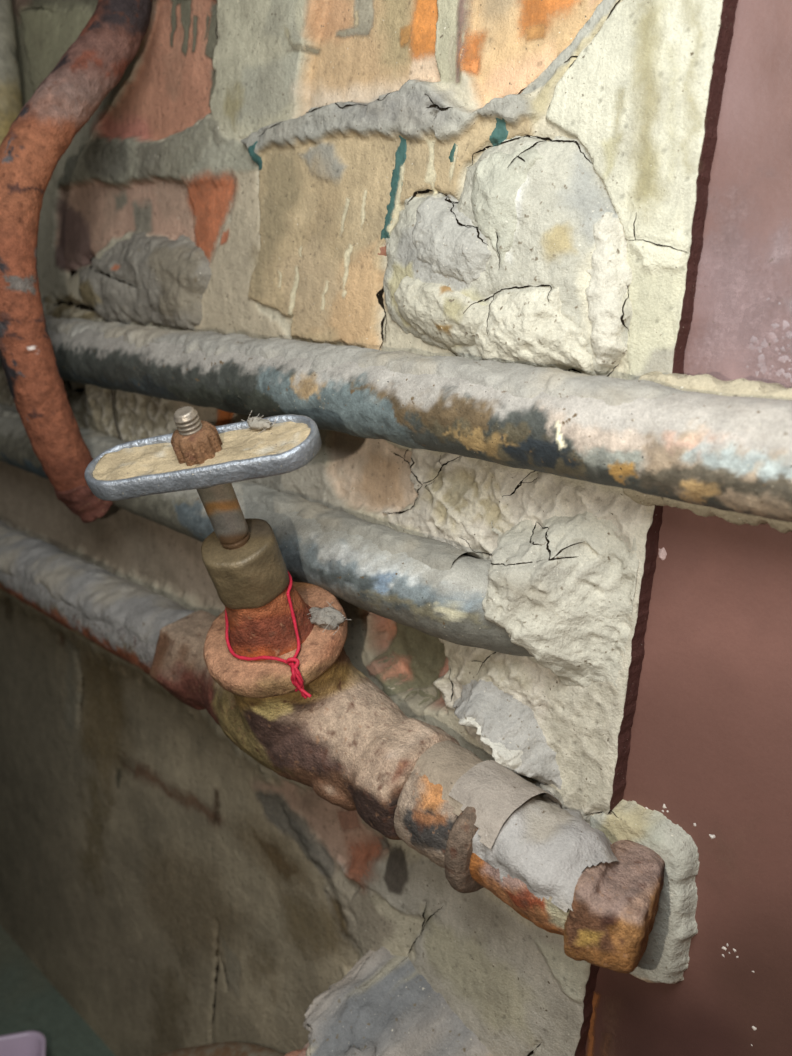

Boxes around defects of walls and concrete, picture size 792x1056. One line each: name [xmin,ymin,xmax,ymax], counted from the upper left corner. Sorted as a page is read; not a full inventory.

flaking render [400,0,438,57]
flaking render [521,0,573,40]
flaking render [459,35,484,73]
peeling [489,118,509,147]
peeling [248,141,262,171]
flaking render [187,175,235,259]
peeling [378,135,407,257]
crack [383,450,459,514]
crack [502,471,538,497]
crack [460,521,585,565]
rust [588,993,610,1056]